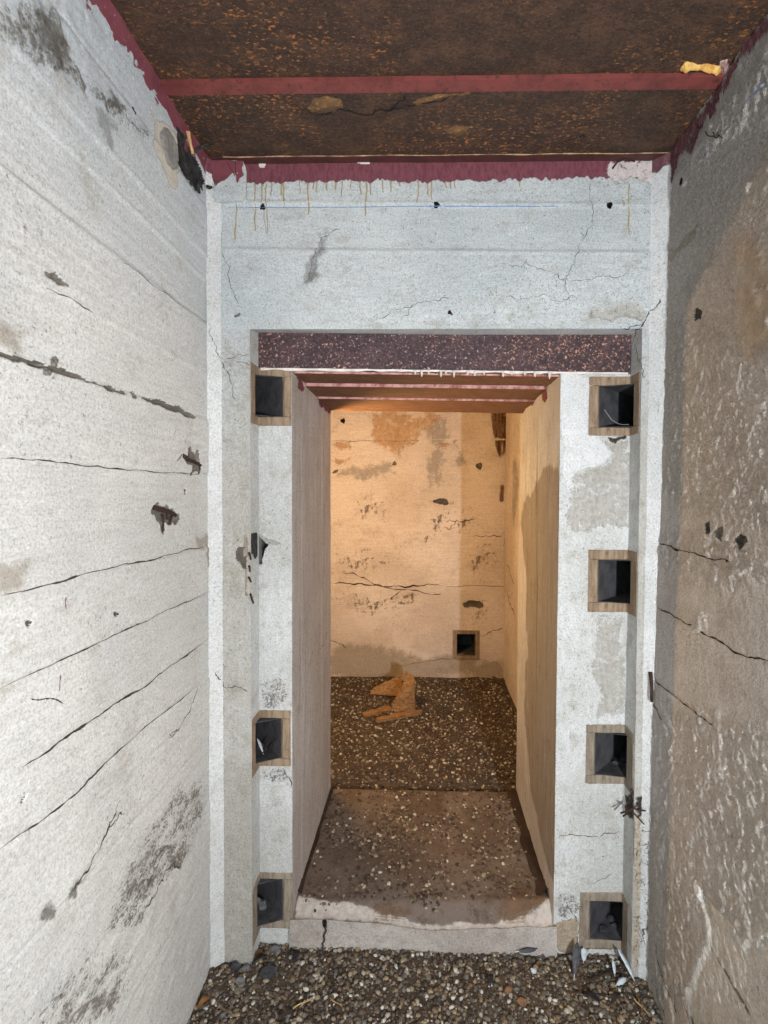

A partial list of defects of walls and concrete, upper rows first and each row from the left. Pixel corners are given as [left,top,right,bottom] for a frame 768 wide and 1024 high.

corrosion [307,96,343,114]
peeling [244,16,768,185]
spalling [153,119,214,197]
corrosion [254,182,285,232]
corrosion [299,180,401,216]
crack [5,457,206,475]
spalling [148,441,203,542]
crack [4,594,204,704]
crack [338,518,537,678]
crack [659,608,768,661]
crack [22,639,208,768]
crack [2,672,248,848]